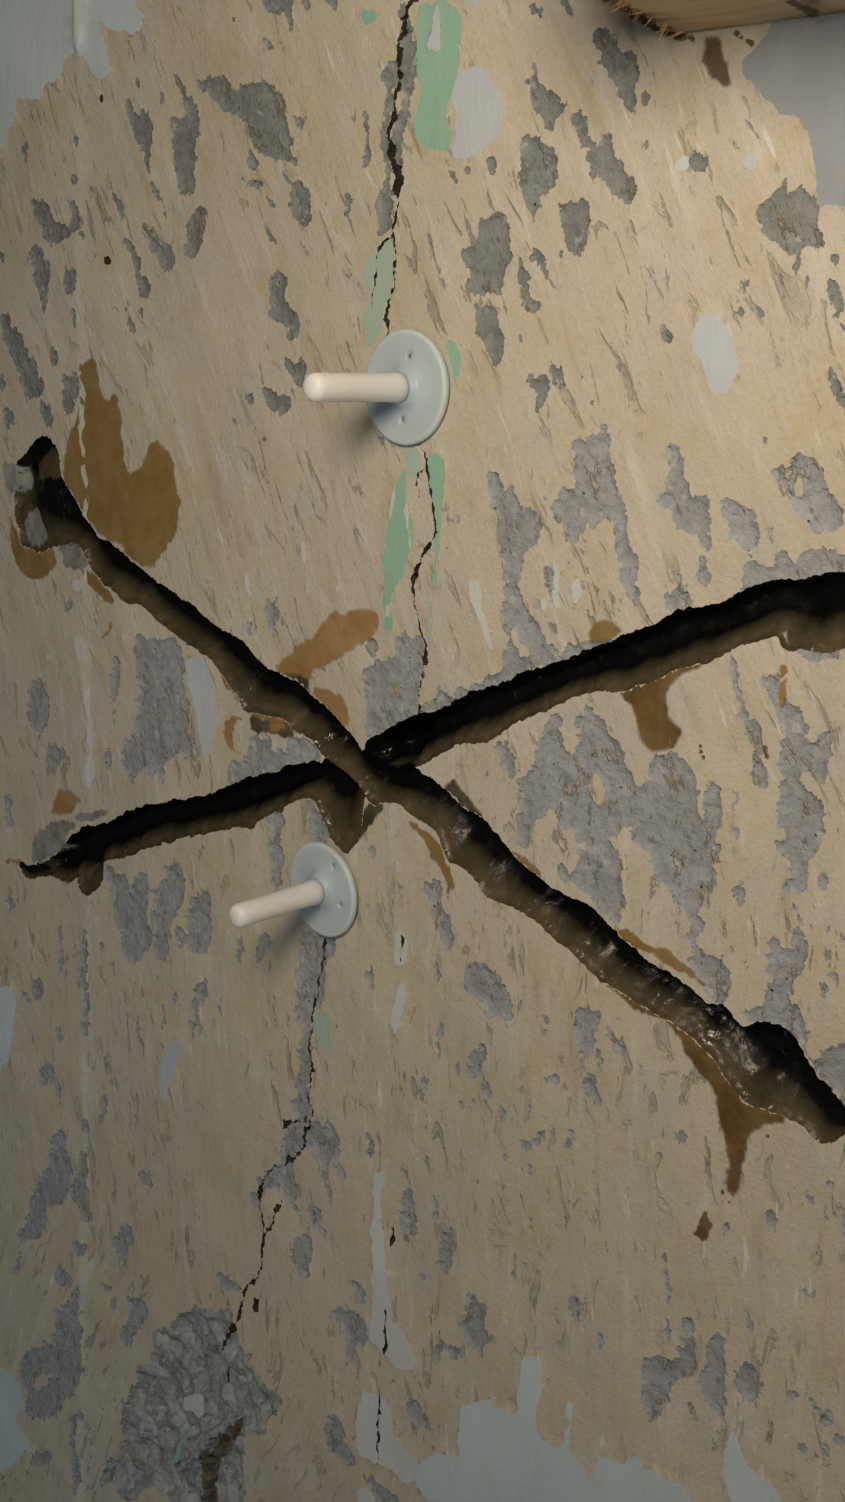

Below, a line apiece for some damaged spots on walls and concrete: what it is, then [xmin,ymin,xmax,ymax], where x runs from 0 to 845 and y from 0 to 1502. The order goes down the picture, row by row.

spalling [112,73,312,333]
crack [371,0,419,336]
peeling [742,12,845,331]
spalling [245,269,307,418]
water stain [3,359,180,603]
water stain [276,610,378,726]
peeling [0,304,845,1154]
crack [410,444,438,714]
water stain [620,664,700,750]
crack [222,938,327,1383]
peeling [329,1132,497,1371]
peeling [323,1356,693,1502]